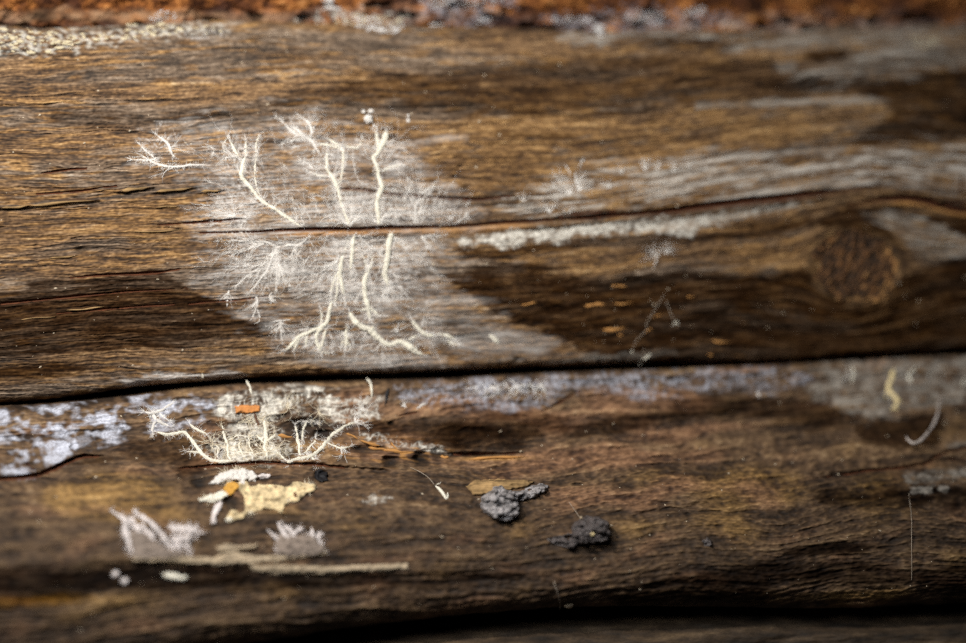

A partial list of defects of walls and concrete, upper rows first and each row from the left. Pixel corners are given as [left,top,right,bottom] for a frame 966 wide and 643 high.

crack [158,175,966,234]
leakage [0,106,966,416]
leakage [0,405,129,475]
leakage [131,372,380,462]